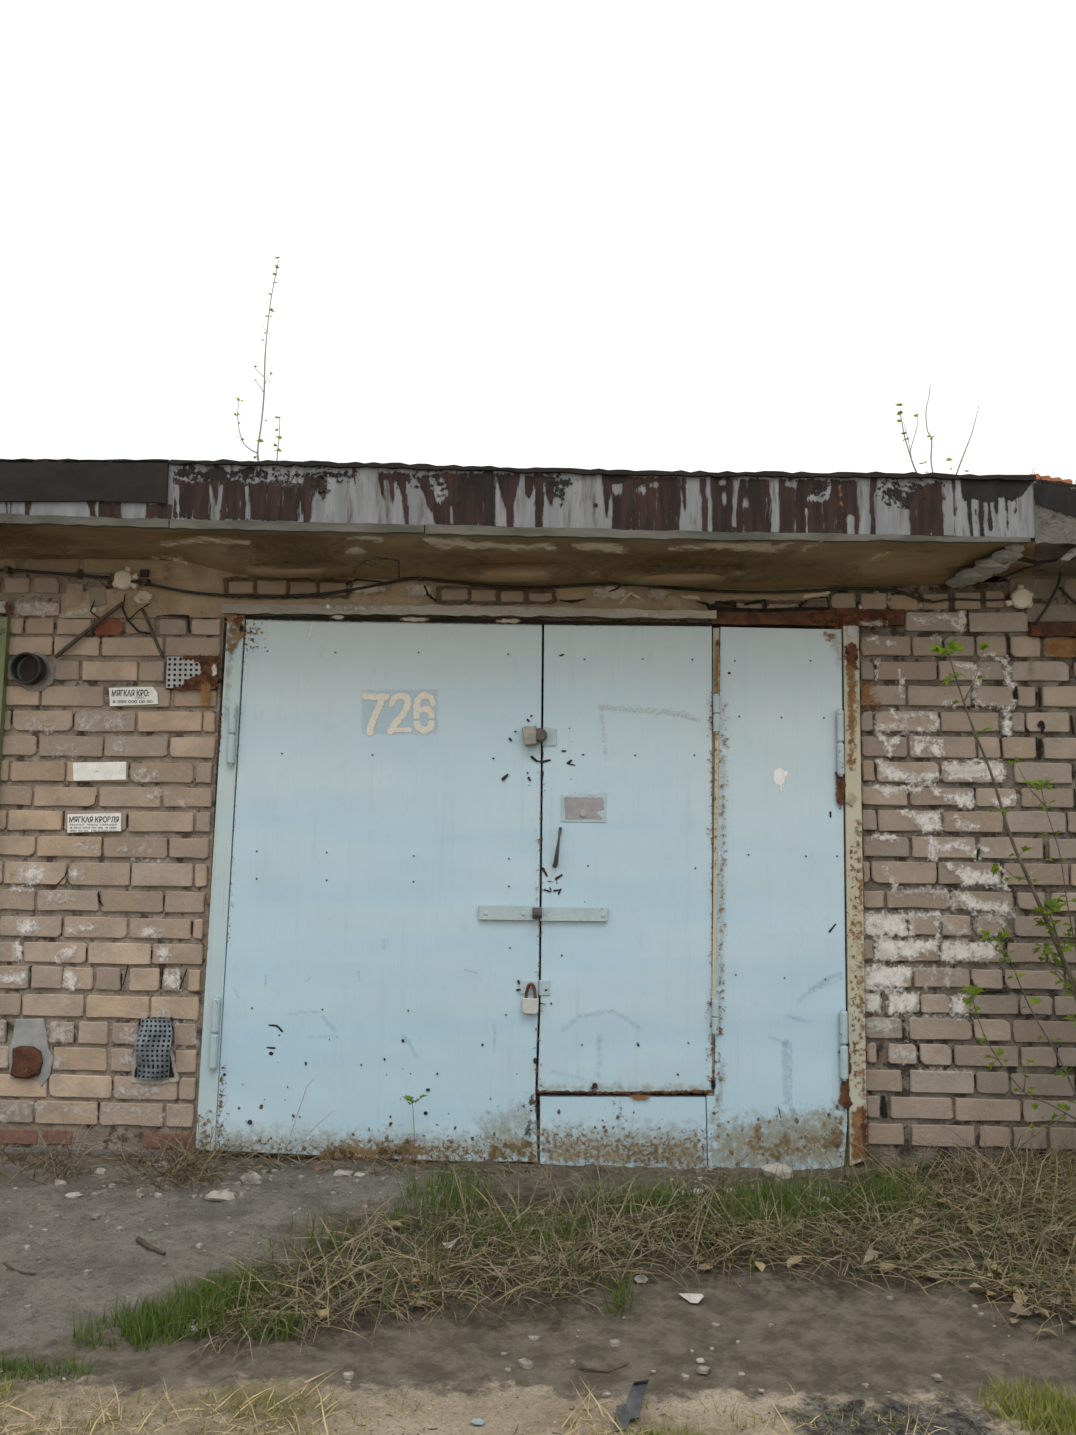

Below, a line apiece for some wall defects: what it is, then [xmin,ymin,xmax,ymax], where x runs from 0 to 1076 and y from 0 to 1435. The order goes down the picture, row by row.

rust [86,501,122,518]
rust [145,474,327,523]
rust [378,471,557,527]
water stain [912,604,966,639]
water stain [956,653,1016,736]
water stain [863,669,1016,1034]
rust [187,610,897,1170]